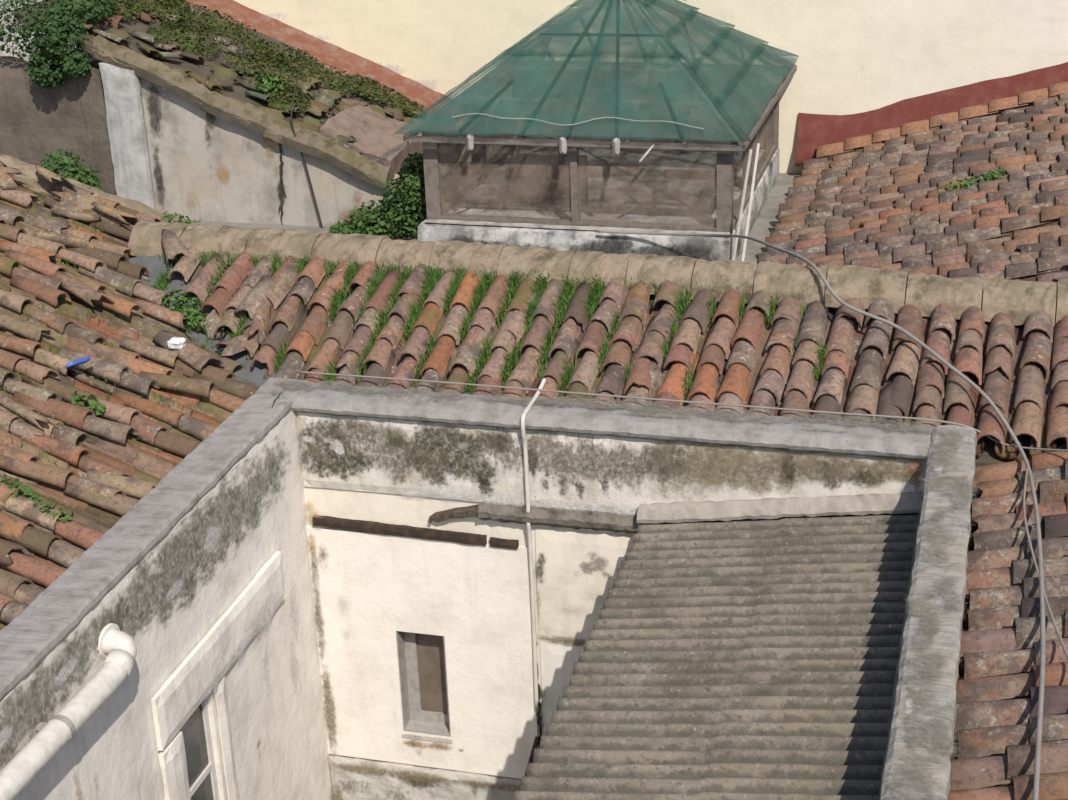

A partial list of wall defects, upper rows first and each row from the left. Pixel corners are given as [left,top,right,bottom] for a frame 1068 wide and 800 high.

crack [279,143,287,225]
damp [299,418,912,497]
damp [581,553,609,576]
crack [535,641,543,747]
damp [333,764,520,800]